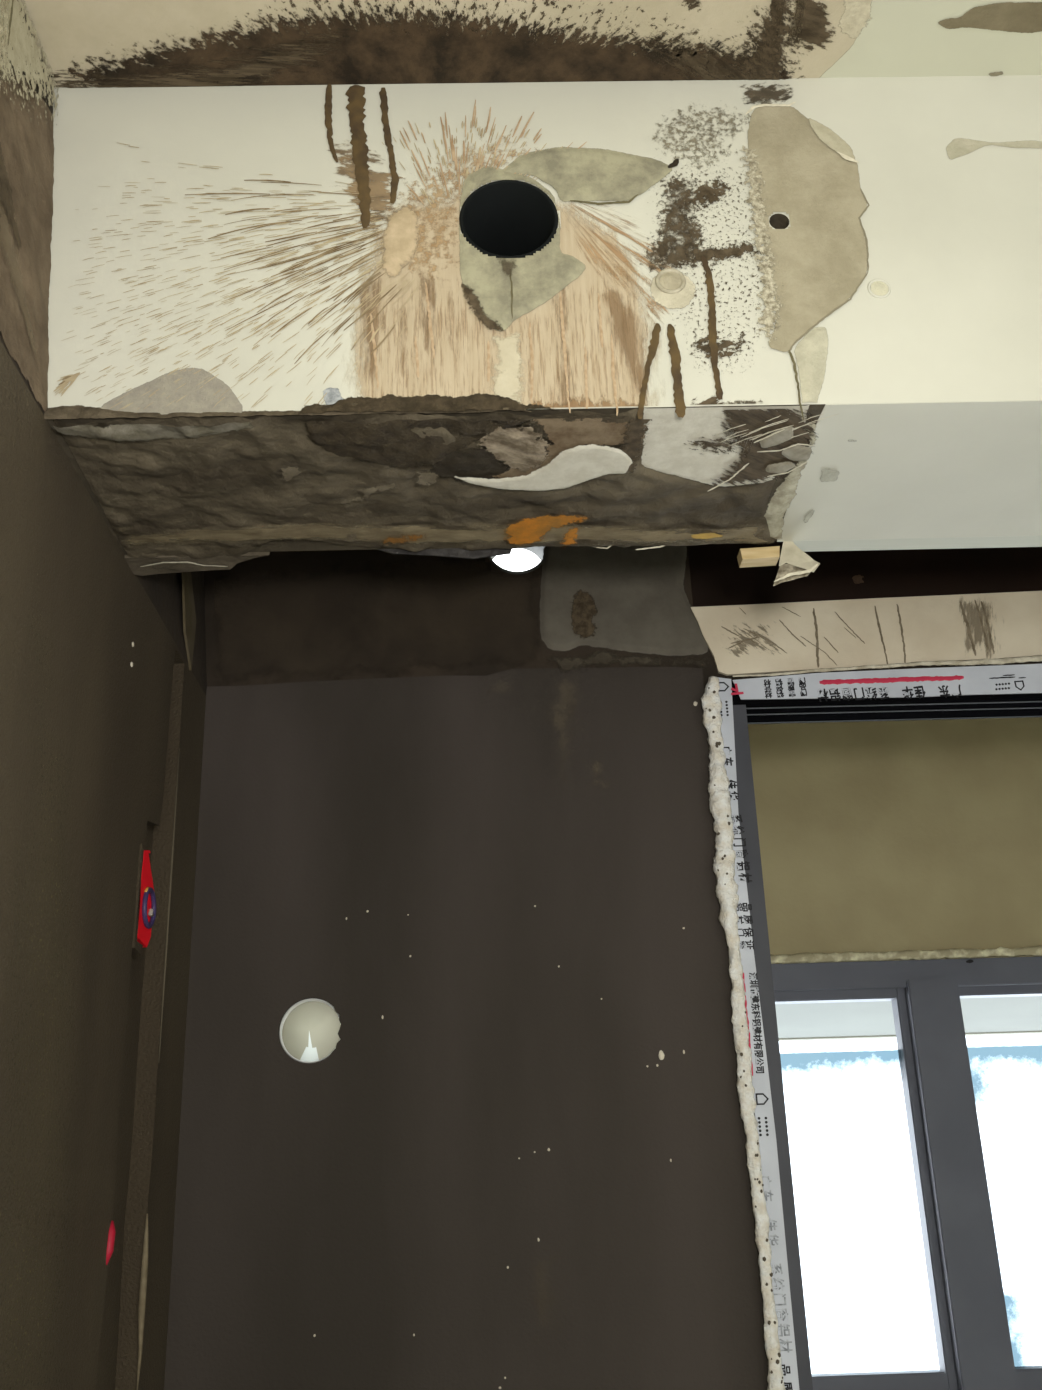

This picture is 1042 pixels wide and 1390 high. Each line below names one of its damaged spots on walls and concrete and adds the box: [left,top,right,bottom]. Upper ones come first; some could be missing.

damp [48,0,803,419]
spalling [0,0,872,680]
corrosion [504,515,589,545]
peeling [938,2,1042,33]